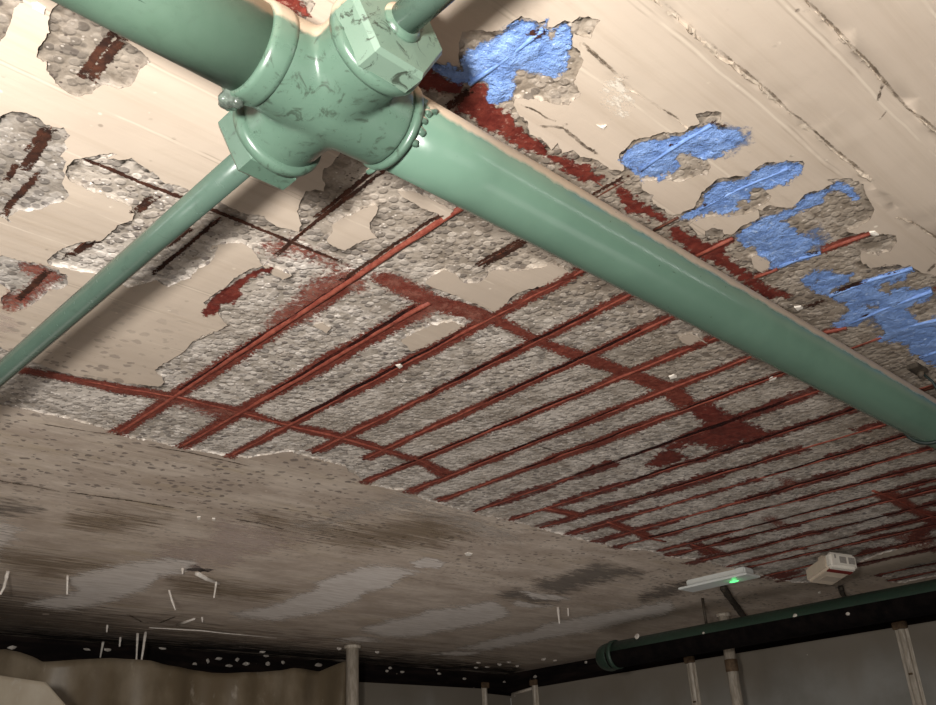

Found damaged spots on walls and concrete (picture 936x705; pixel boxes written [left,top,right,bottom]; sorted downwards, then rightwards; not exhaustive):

spalling [0,0,150,96]
spalling [0,111,189,310]
corrosion [81,158,183,213]
corrosion [152,170,386,275]
corrosion [339,214,444,281]
corrosion [473,239,528,269]
corrosion [591,175,630,195]
spalling [420,16,936,399]
spalling [0,153,936,583]
damp [157,494,517,599]
damp [501,564,643,605]
damp [639,582,686,602]